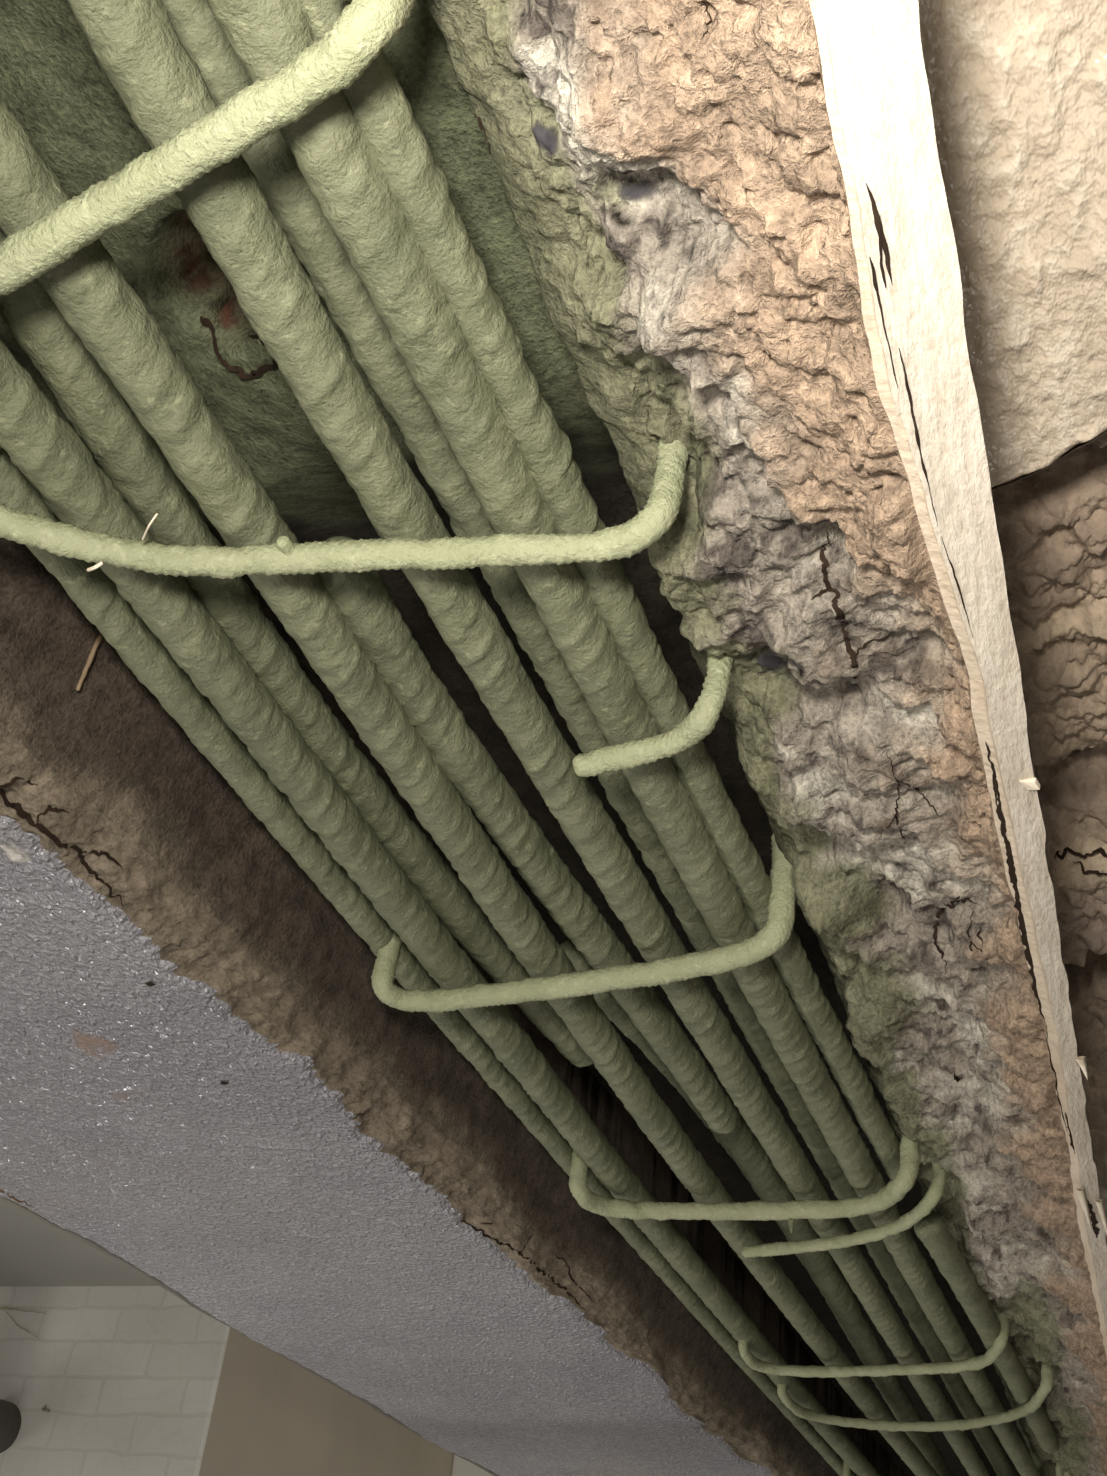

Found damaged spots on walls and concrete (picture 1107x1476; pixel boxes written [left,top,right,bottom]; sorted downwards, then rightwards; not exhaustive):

spalling [0,0,152,197]
spalling [0,313,103,470]
spalling [99,194,381,546]
spalling [318,294,456,538]
crack [866,183,973,637]
crack [811,530,890,693]
crack [0,776,123,906]
spalling [0,538,839,1476]
spalling [377,0,1107,1476]
crack [985,741,1075,1154]
crack [1054,847,1107,876]
crack [1087,1200,1100,1238]